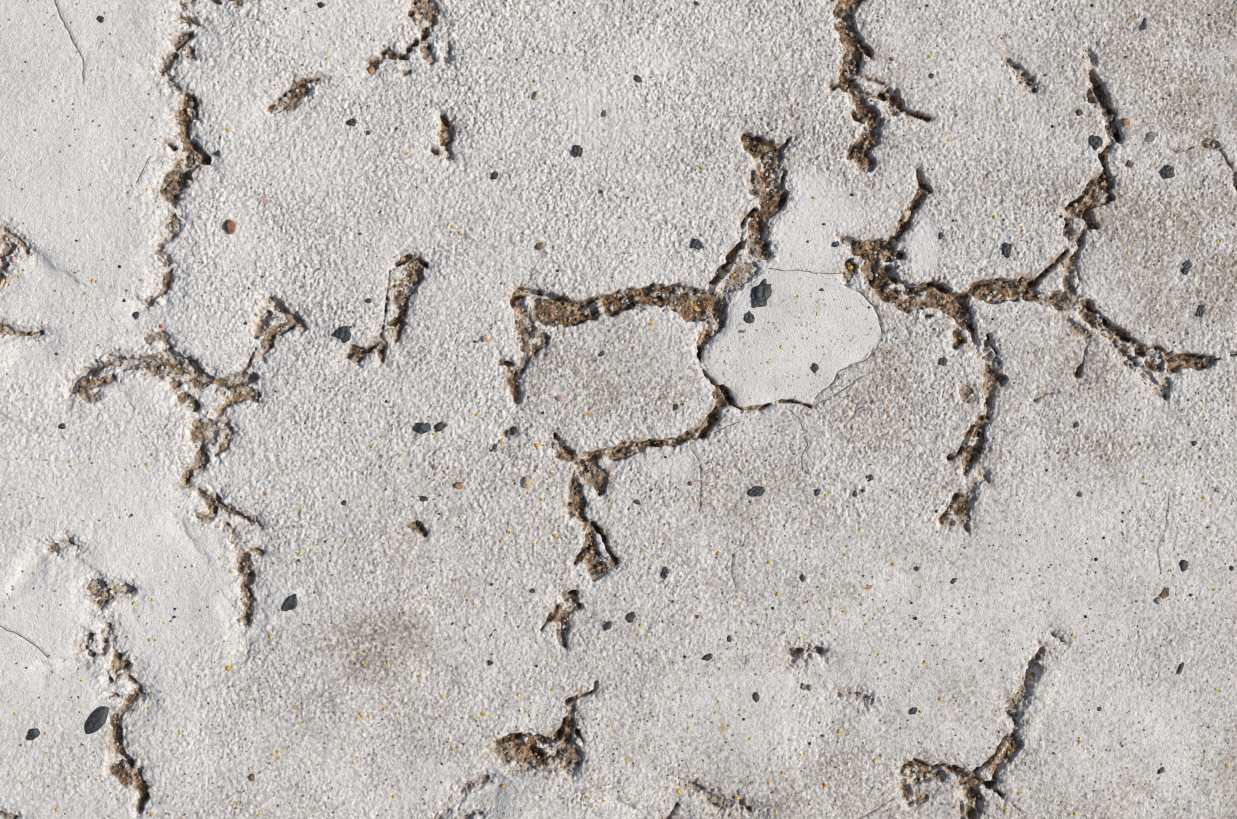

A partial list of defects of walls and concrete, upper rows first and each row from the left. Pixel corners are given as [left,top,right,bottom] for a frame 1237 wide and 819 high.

crack [366,0,452,76]
crack [825,0,930,172]
crack [0,227,30,283]
crack [0,324,44,340]
crack [69,0,307,628]
crack [345,253,428,368]
peeling [703,272,880,407]
crack [497,49,1217,647]
crack [81,622,150,817]
crack [859,633,1067,819]
crack [438,775,491,819]
crack [666,782,750,819]